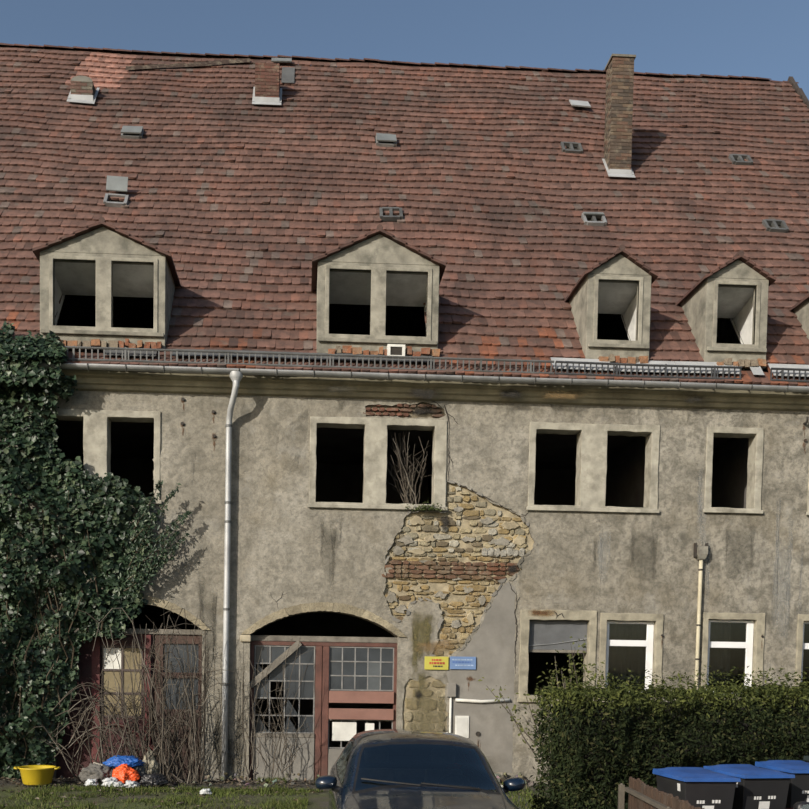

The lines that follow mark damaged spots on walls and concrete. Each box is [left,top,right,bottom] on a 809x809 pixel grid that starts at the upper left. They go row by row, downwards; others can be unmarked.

flaking render [363,404,444,418]
crack [433,401,529,520]
spalling [382,480,538,657]
crack [509,582,520,674]
spalling [402,676,448,731]